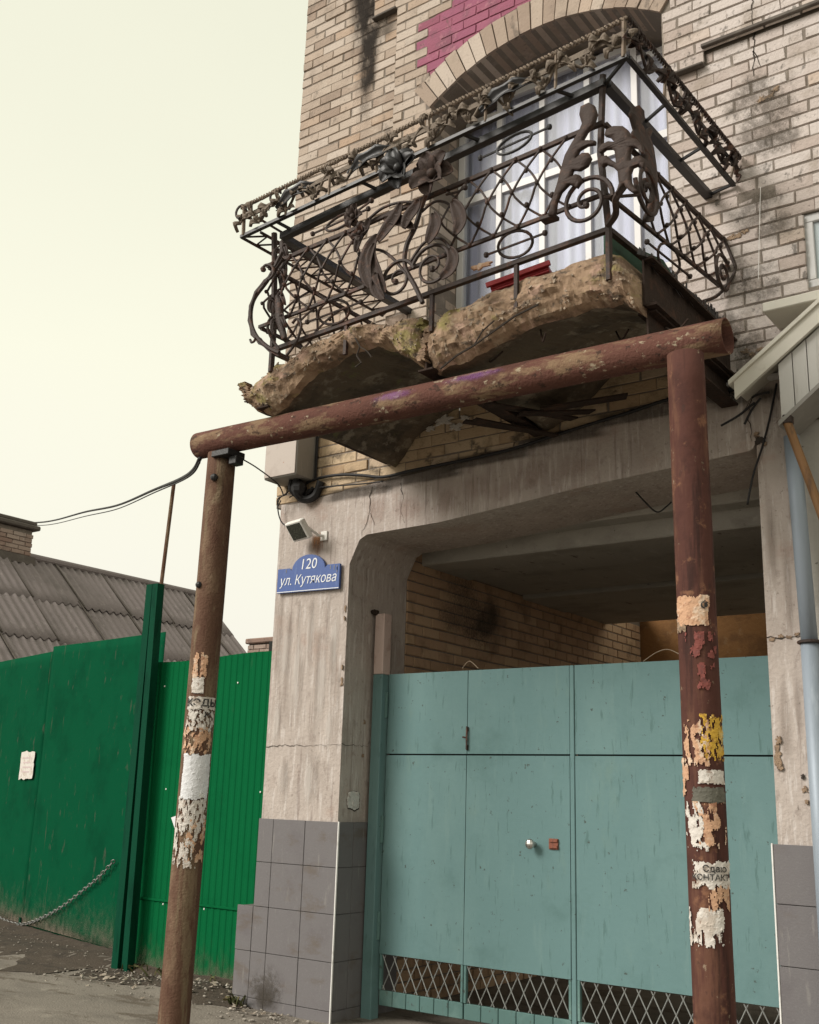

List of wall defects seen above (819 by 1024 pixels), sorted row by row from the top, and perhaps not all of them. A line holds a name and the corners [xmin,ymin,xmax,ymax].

spalling [432,256,639,366]